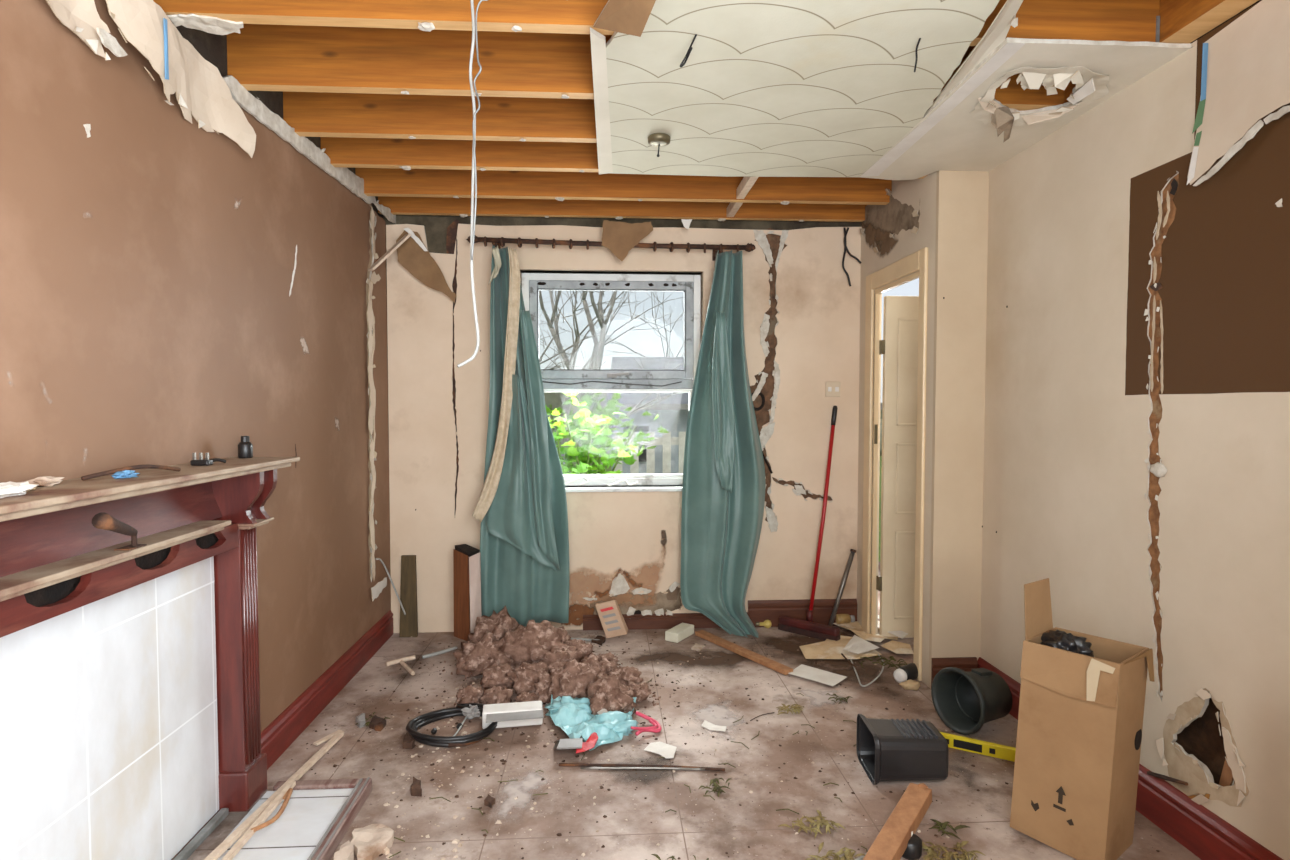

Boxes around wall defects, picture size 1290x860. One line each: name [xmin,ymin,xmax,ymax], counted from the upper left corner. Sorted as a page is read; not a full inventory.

peeling [988,73,1028,107]
peeling [1047,70,1084,115]
flaking render [860,189,920,253]
crack [446,219,461,512]
crack [750,228,832,532]
crack [1144,171,1179,697]
flaking render [584,582,684,616]
hole [1156,688,1249,807]